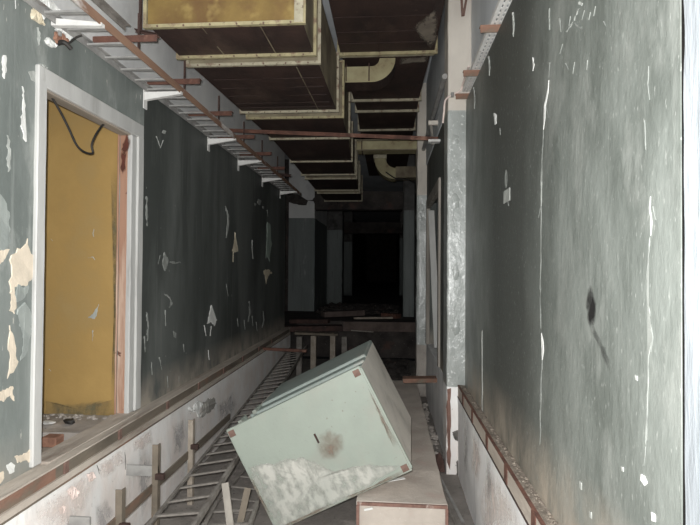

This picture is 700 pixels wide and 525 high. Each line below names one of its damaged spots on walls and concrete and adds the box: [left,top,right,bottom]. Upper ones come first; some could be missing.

spalling [40,0,61,10]
spalling [30,8,73,48]
rust [121,136,130,172]
peeling [225,206,238,253]
peeling [254,199,272,283]
peeling [0,194,33,402]
peeling [204,305,217,336]
damp [587,291,595,323]